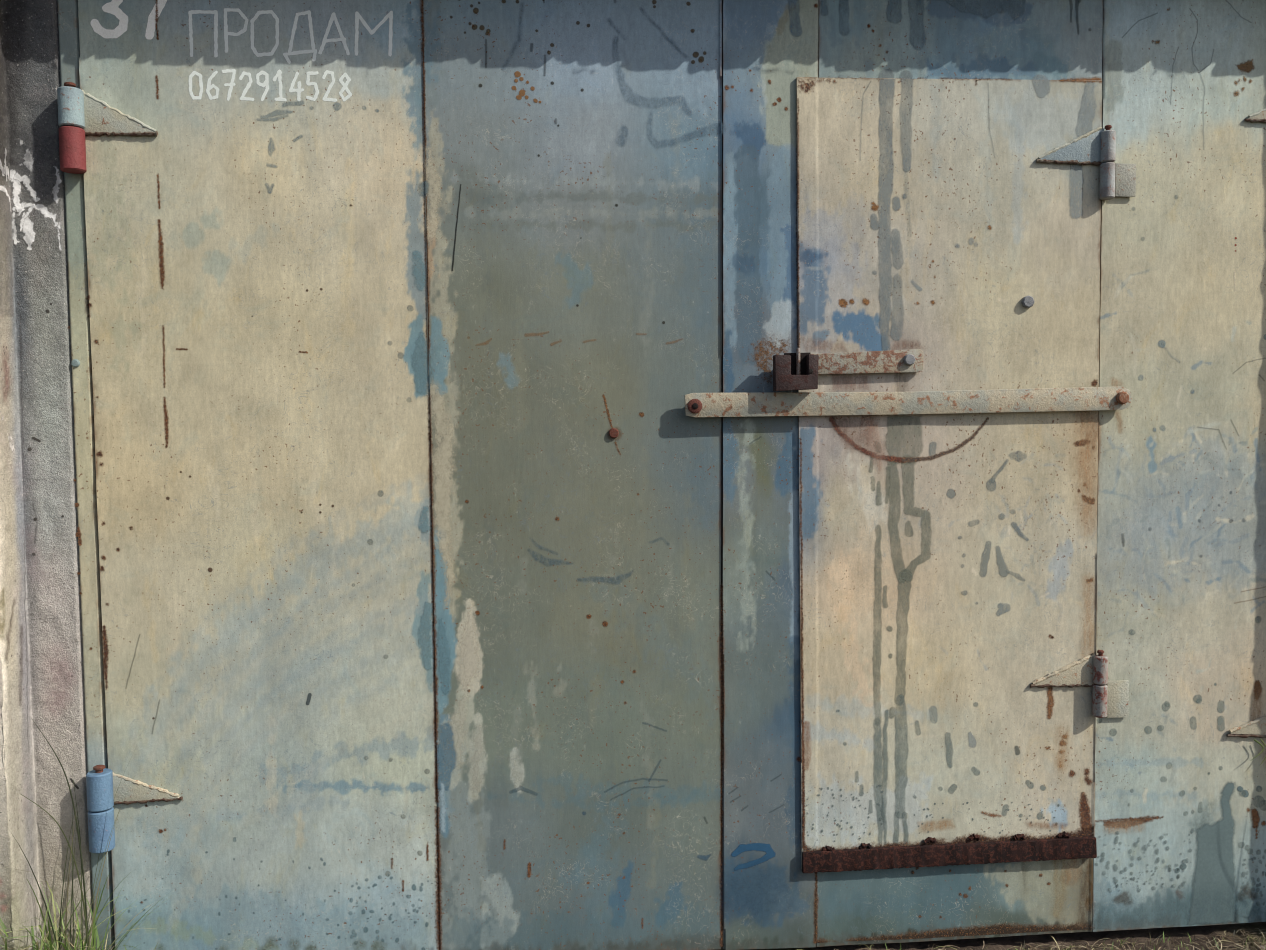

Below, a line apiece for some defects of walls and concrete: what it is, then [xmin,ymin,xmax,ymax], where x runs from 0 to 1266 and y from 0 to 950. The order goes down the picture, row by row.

corrosion [459,0,490,35]
corrosion [512,71,541,103]
corrosion [1234,59,1254,96]
peeling [419,150,440,238]
peeling [412,332,482,832]
corrosion [797,433,1163,852]
corrosion [1254,680,1262,712]